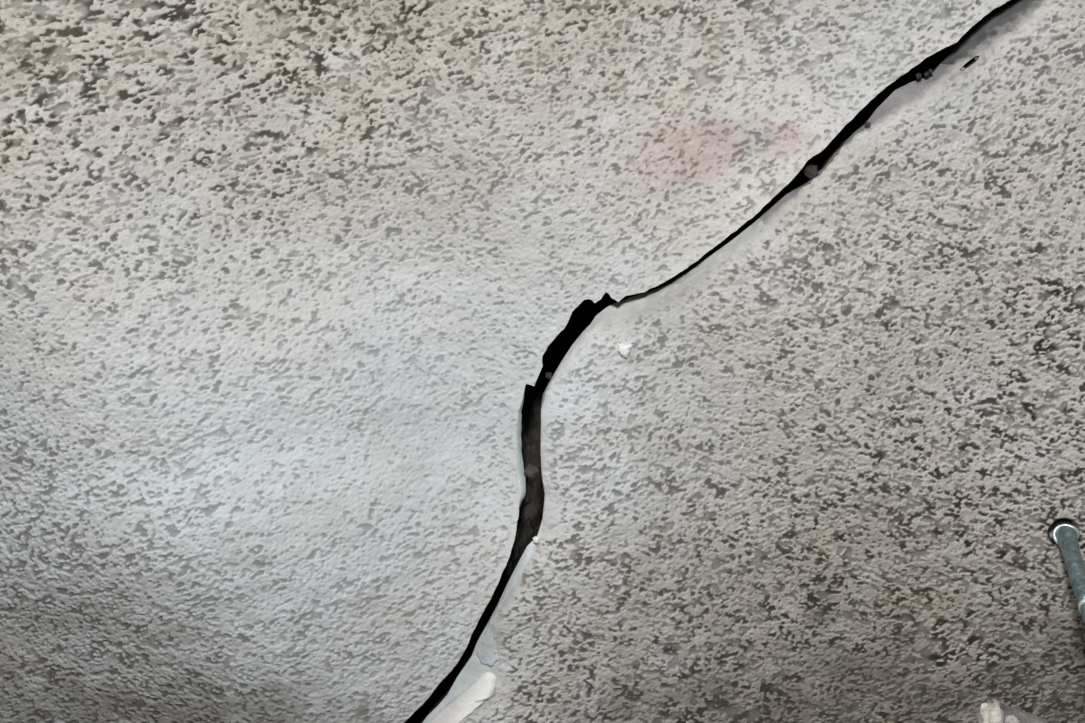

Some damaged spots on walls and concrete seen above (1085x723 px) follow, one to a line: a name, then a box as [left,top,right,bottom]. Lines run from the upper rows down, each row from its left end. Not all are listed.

crack [404,0,1049,723]